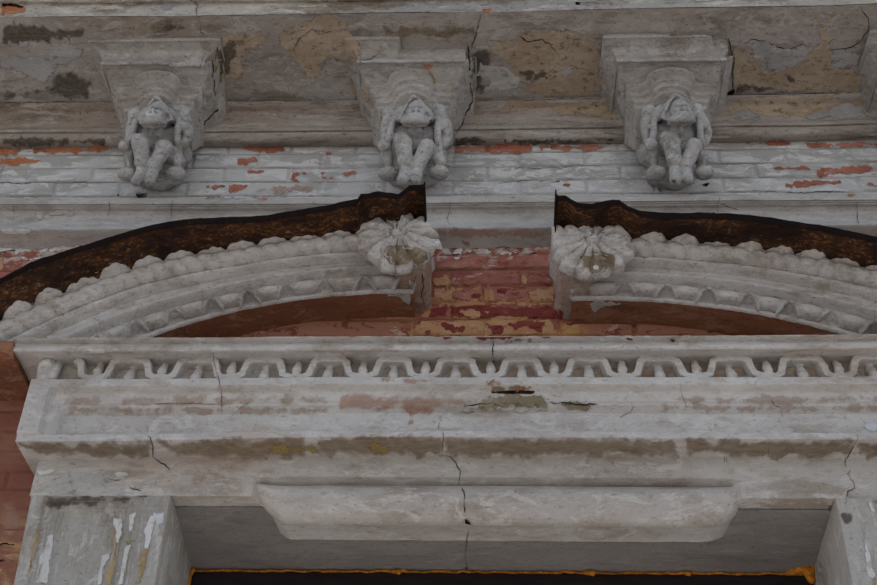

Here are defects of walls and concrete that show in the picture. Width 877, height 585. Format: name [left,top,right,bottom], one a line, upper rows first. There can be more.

leakage [3,24,83,44]
leakage [50,72,91,99]
crack [191,0,219,126]
crack [456,9,595,134]
crack [727,38,802,95]
spalling [728,41,867,119]
peeling [774,165,876,188]
peeling [387,274,573,345]
crack [138,354,248,410]
spalling [461,385,595,414]
crack [438,422,471,569]
peeling [113,512,136,585]